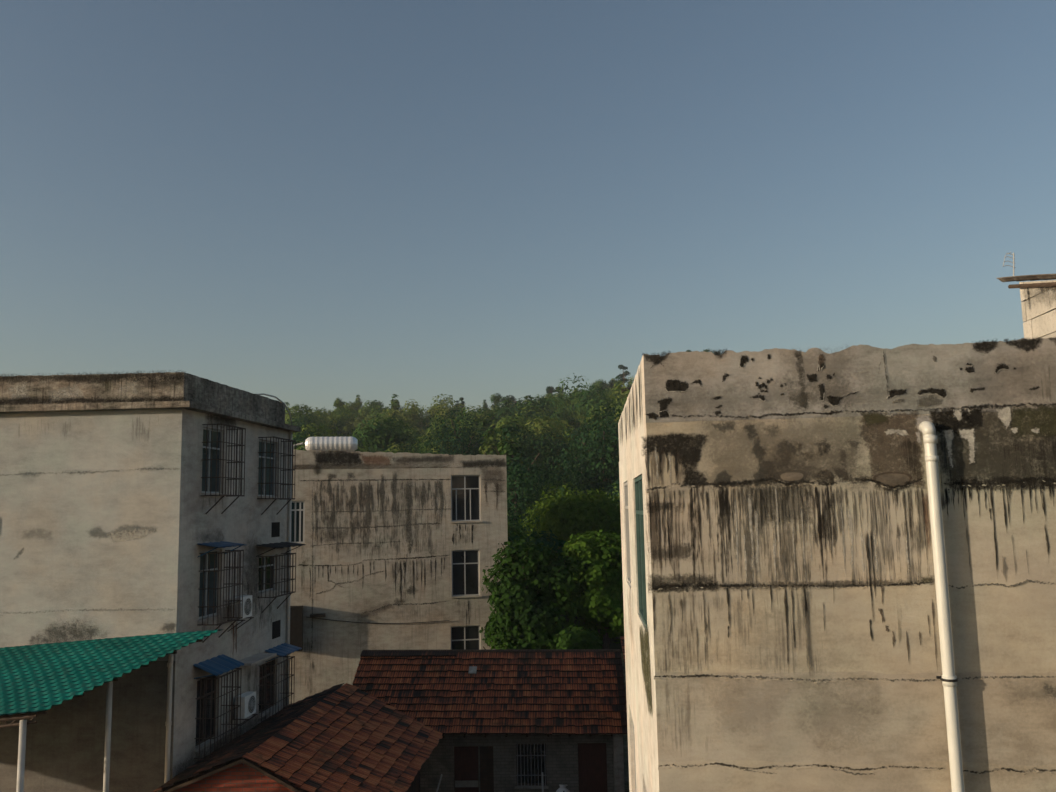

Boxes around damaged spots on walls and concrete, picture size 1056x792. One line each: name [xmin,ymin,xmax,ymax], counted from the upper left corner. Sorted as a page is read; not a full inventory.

spalling [647,379,702,420]
spalling [752,377,786,402]
spalling [806,354,859,408]
flaking render [996,406,1018,433]
crack [647,476,1056,493]
leakage [310,450,505,601]
leakage [619,351,1056,715]
crack [651,580,1054,593]
crack [654,674,1056,685]
crack [658,762,1056,777]